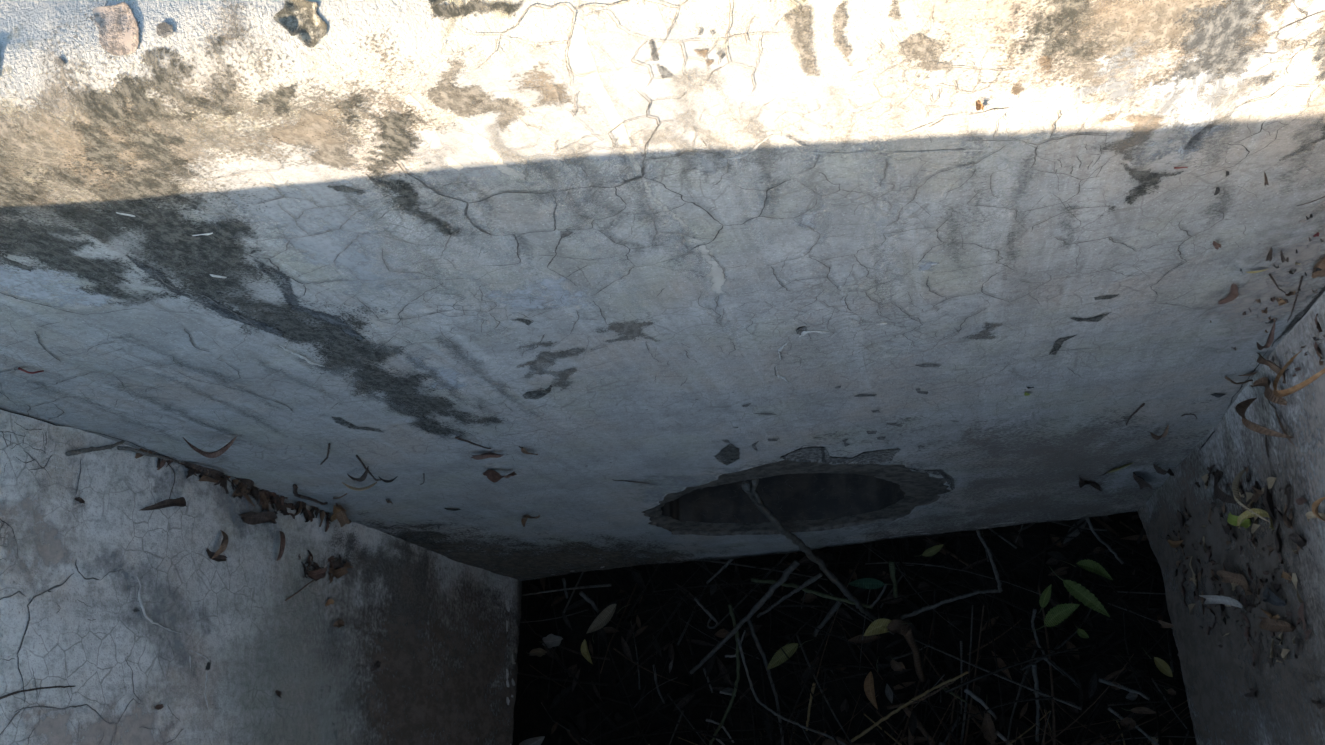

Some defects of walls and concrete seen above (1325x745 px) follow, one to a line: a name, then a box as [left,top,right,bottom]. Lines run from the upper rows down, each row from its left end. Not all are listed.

spalling [274,0,327,48]
damp [0,0,830,438]
crack [0,0,1325,585]
damp [959,323,1003,340]
damp [1049,294,1119,355]
crack [0,562,183,745]